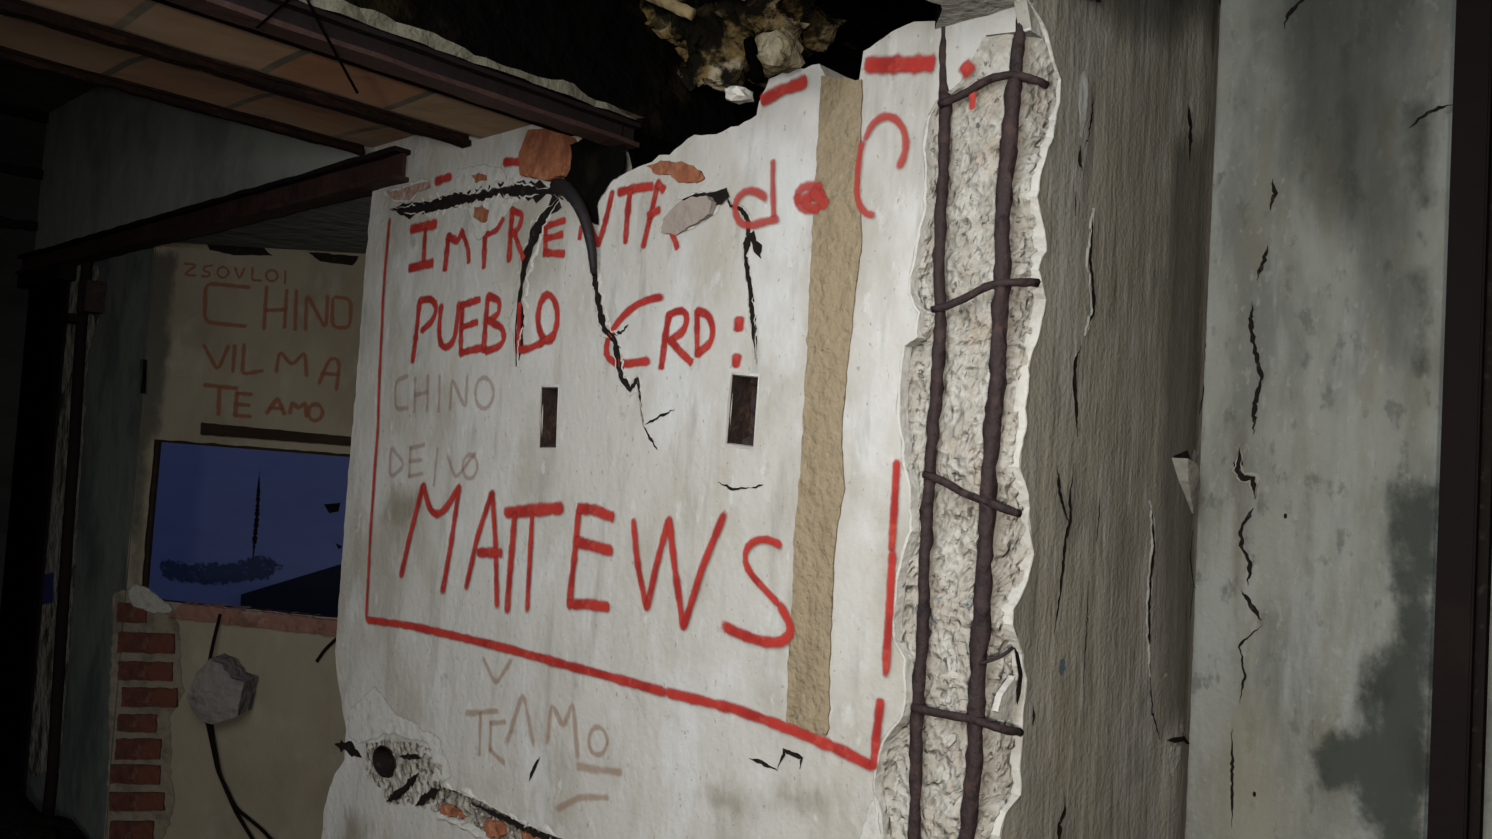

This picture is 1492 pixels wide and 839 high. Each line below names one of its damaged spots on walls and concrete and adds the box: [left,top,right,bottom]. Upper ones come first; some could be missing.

flaking render [640,0,847,94]
peeling [1078,71,1094,147]
flaking render [106,584,184,839]
peeling [159,556,283,585]
flaking render [348,687,577,839]
crack [390,176,673,450]
crack [727,198,762,364]
spalling [859,0,1061,839]
crack [1054,145,1100,681]
crack [1146,500,1160,739]
crack [1230,245,1268,826]
leakage [1315,487,1437,839]